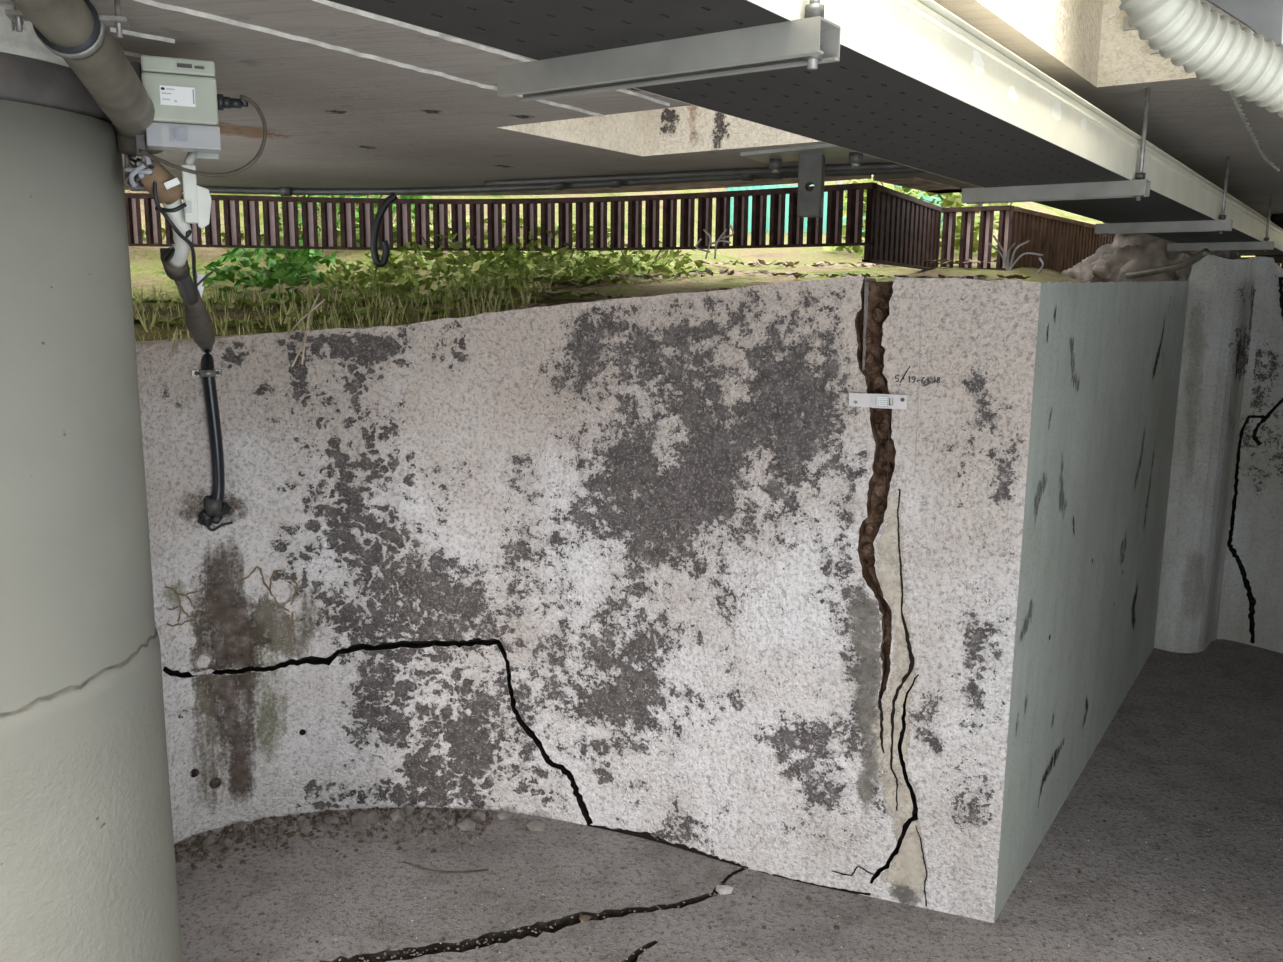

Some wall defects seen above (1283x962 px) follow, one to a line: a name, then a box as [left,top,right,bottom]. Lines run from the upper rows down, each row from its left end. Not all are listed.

peeling [217,341,254,370]
leakage [190,540,315,804]
crack [0,282,928,962]
peeling [253,285,1009,893]
leakage [848,586,884,804]
peeling [933,353,1025,548]
crack [1227,398,1283,643]
crack [1275,277,1283,321]